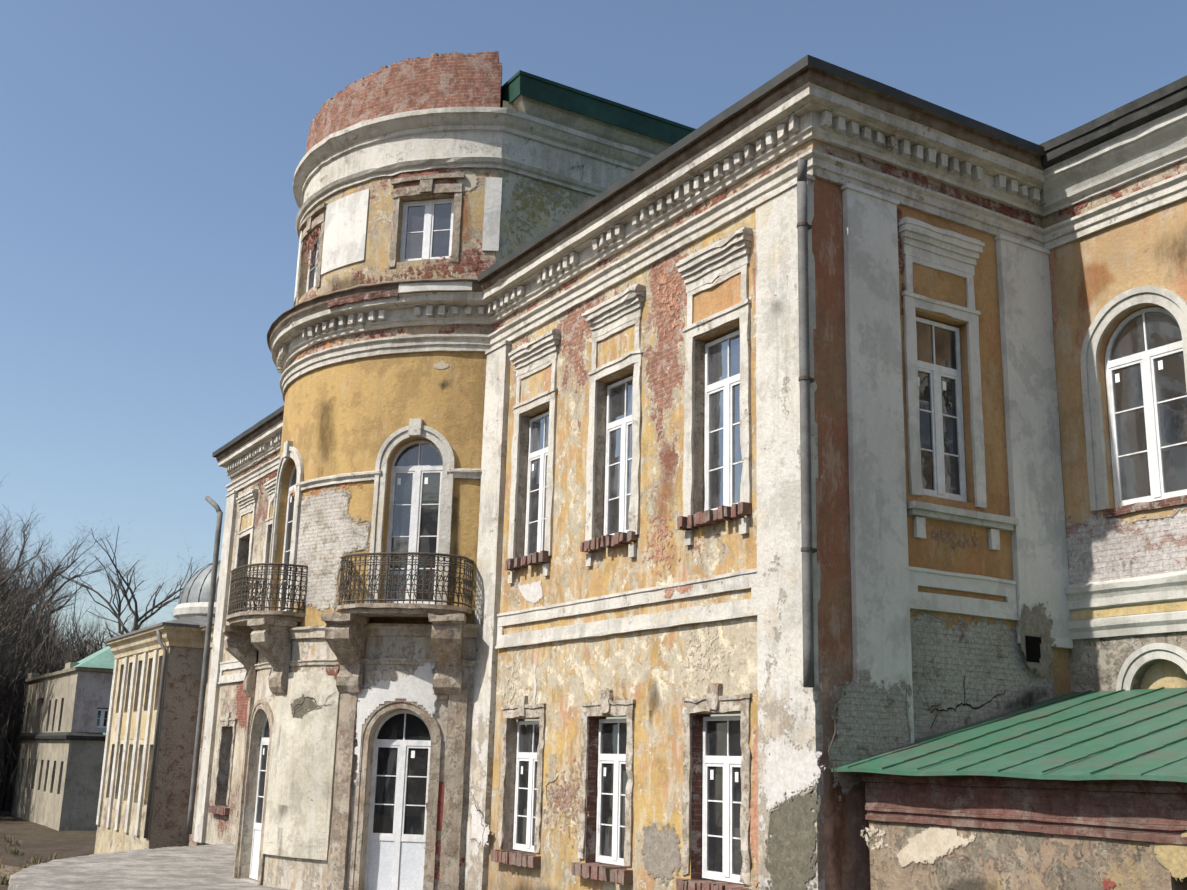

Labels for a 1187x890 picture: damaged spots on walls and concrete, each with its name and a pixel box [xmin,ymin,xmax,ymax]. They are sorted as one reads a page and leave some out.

peeling [646,257,687,353]
flaking render [290,481,371,612]
flaking render [1066,504,1187,585]
flaking render [229,656,249,731]
spalling [827,609,1062,801]
crack [925,678,1006,727]
spalling [749,729,821,890]
peeling [1149,830,1187,881]